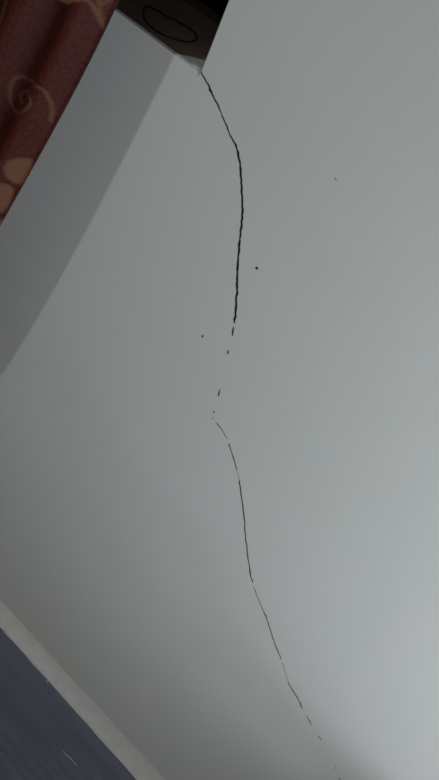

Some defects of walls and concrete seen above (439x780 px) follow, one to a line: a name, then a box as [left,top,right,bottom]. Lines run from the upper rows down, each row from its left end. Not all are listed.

crack [201,72,244,354]
crack [212,390,281,659]